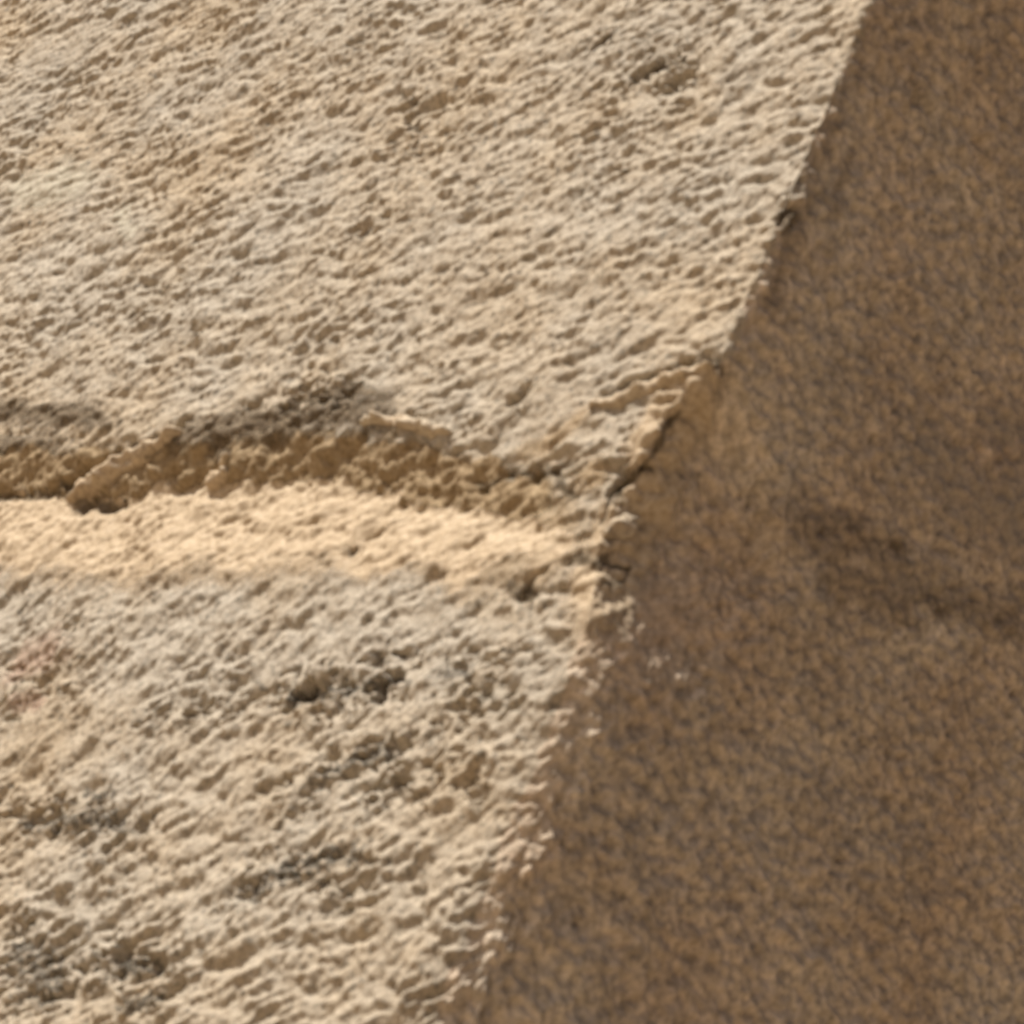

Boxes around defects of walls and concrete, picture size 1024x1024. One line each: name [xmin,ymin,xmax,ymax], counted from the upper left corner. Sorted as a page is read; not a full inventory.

crack [485,467,574,497]
crack [602,414,678,524]
crack [0,485,124,514]